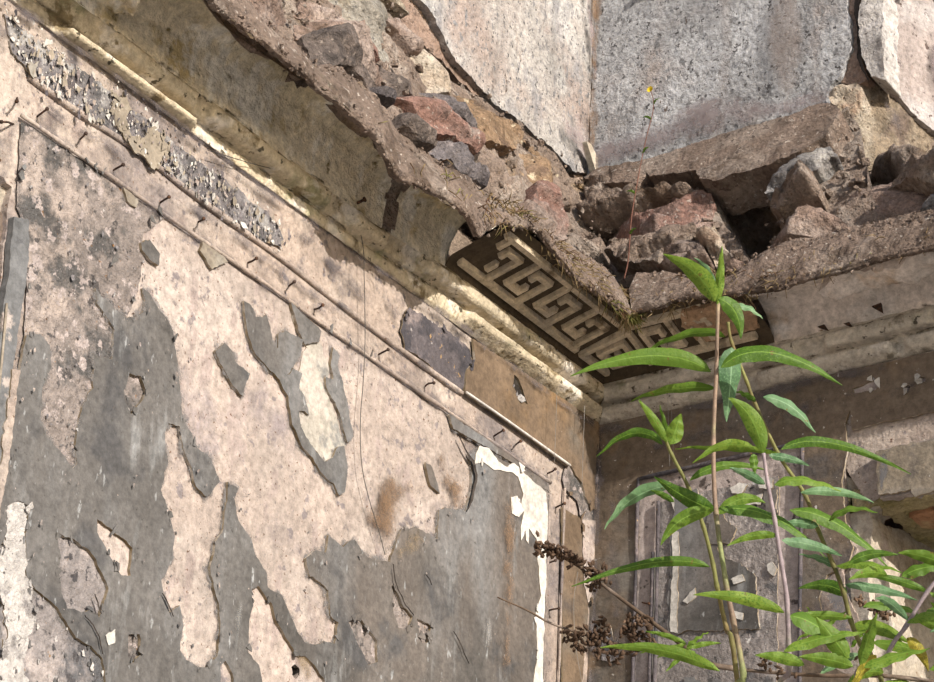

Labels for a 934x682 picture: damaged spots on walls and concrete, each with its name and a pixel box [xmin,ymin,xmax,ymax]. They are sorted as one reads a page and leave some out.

flaking render [858,0,901,97]
peeling [3,2,295,262]
peeling [582,141,598,173]
flaking render [819,252,934,300]
peeling [16,121,550,682]
peeling [562,466,596,605]
peeling [671,496,688,519]
peeling [730,475,778,513]
peeling [666,514,767,635]
peeling [767,562,778,576]
peeling [0,601,10,658]